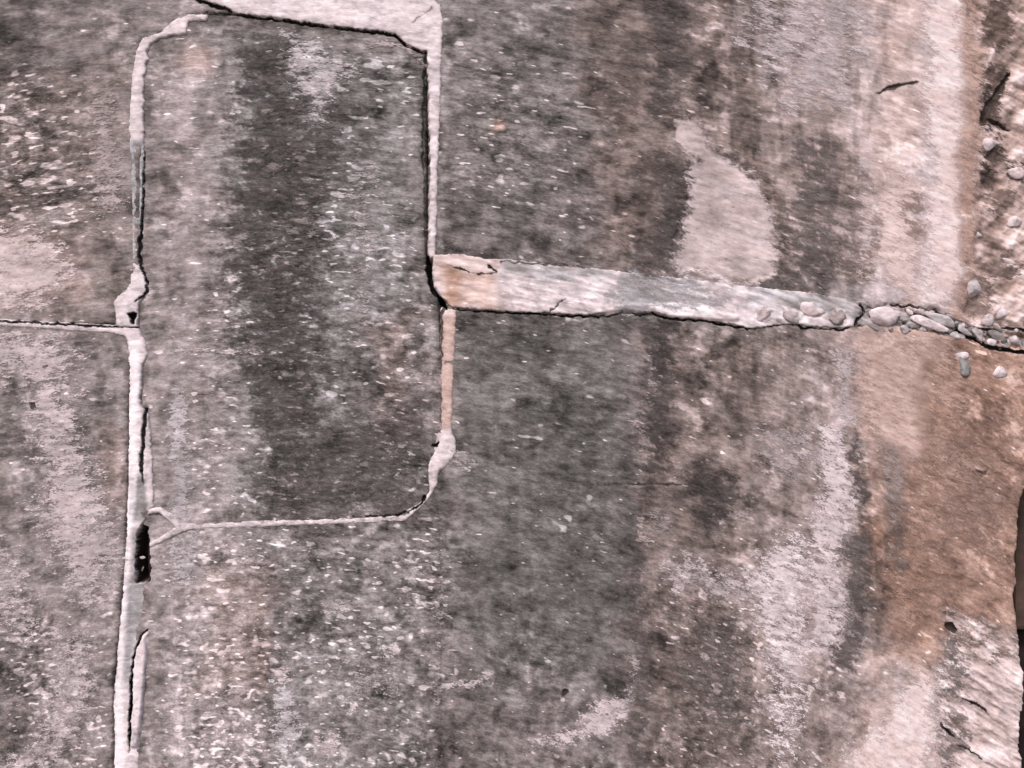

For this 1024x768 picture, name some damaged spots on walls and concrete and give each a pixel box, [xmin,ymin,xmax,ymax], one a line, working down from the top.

crack [0,153,149,328]
water stain [175,27,438,522]
crack [196,0,866,433]
crack [891,304,1024,354]
crack [139,408,148,485]
crack [352,495,427,517]
water stain [626,313,747,529]
water stain [658,332,874,766]
crack [127,629,148,750]